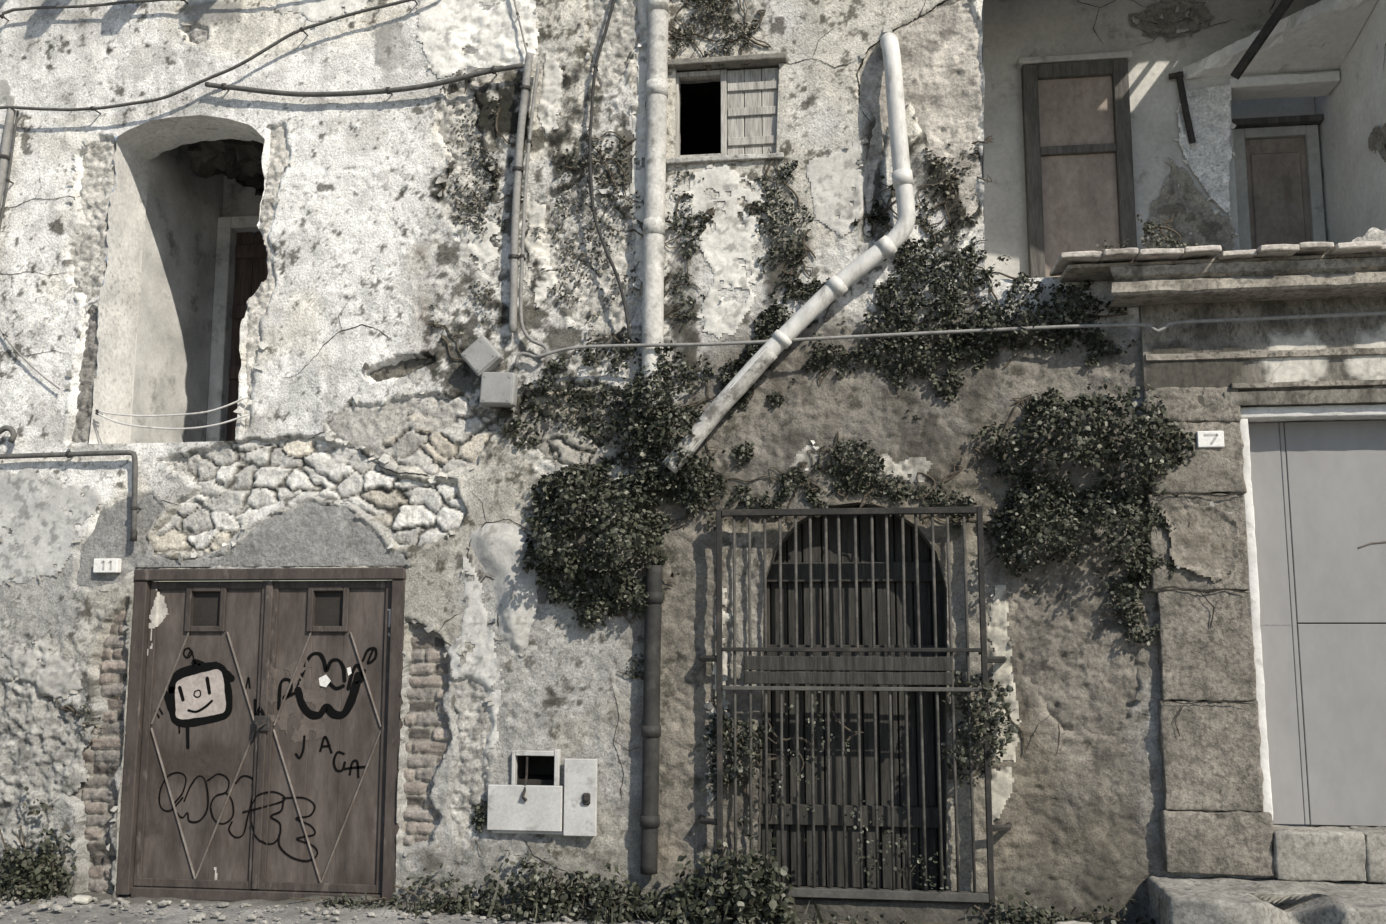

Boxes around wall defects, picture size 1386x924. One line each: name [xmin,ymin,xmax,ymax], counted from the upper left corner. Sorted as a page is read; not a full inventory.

spalling [1367,123,1386,162]
peeling [368,450,390,464]
flaking render [0,467,413,591]
peeling [1,634,83,702]
peeling [443,557,504,769]